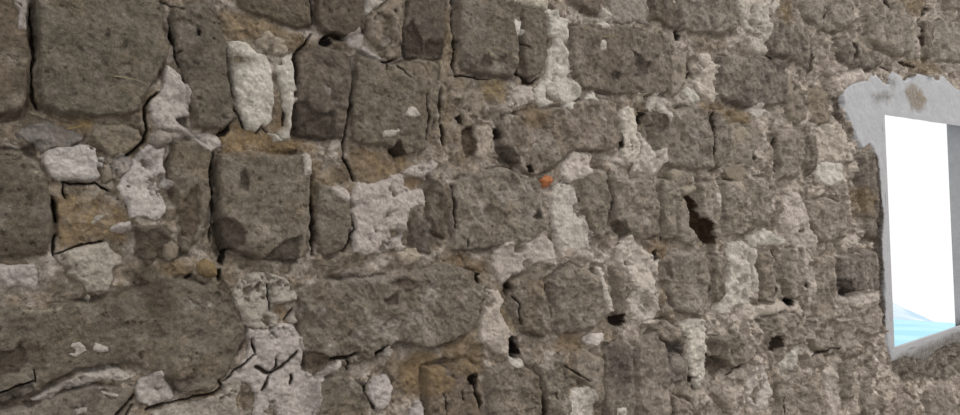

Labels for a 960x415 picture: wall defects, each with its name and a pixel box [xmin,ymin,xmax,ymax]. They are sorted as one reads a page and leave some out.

crack [125,93,156,156]
crack [341,99,353,181]
crack [50,181,108,256]
crack [114,340,297,415]